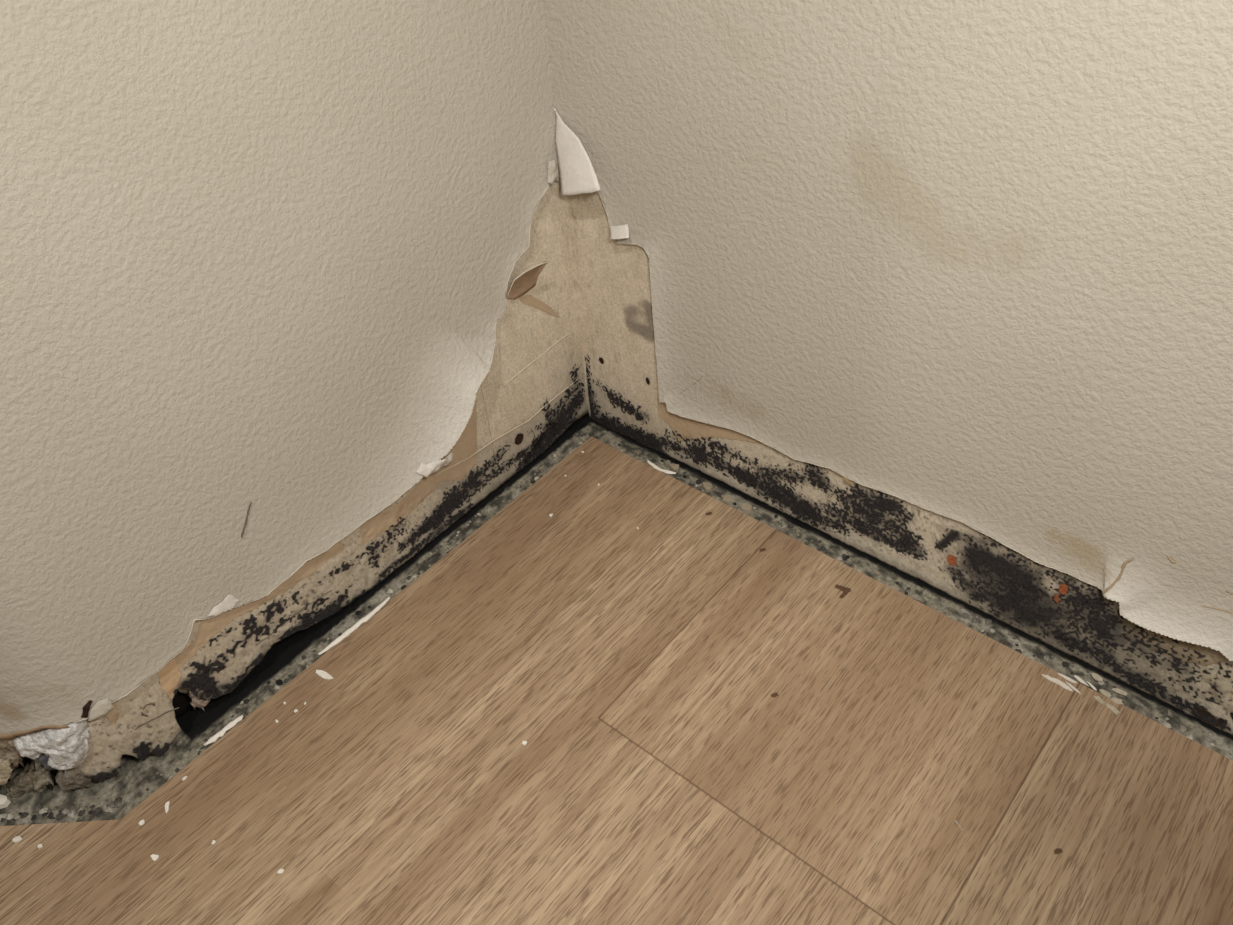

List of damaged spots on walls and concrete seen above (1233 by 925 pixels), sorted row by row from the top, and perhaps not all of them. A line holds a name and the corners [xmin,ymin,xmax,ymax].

peeling [0,108,1233,792]
water stain [173,355,1233,731]